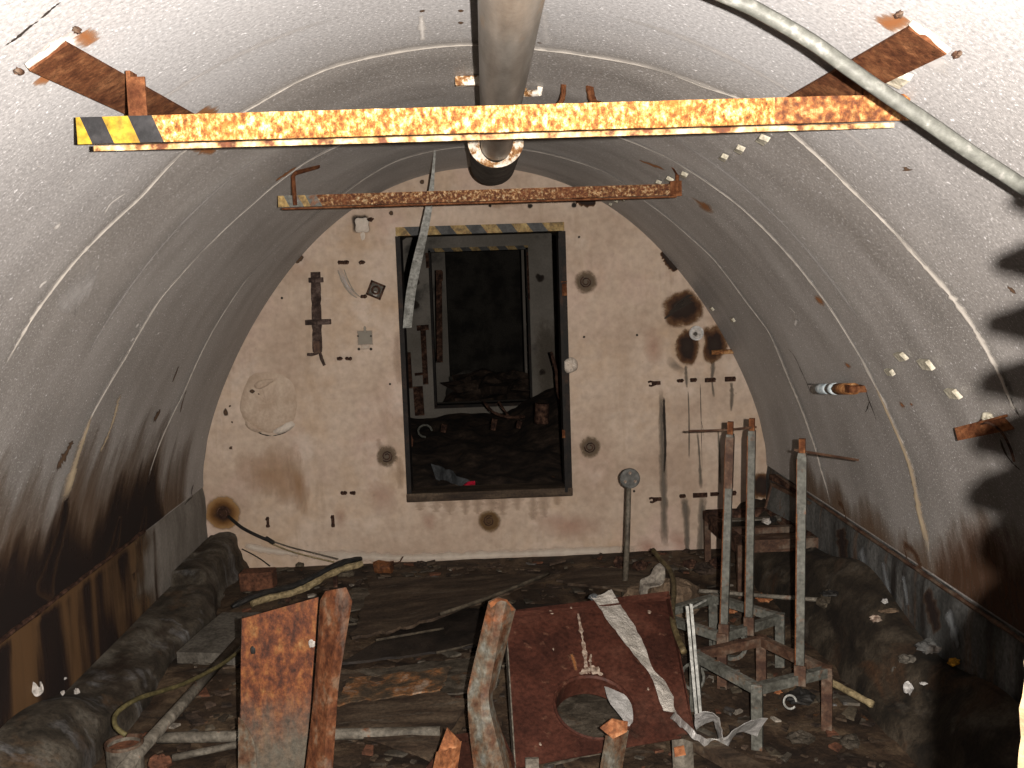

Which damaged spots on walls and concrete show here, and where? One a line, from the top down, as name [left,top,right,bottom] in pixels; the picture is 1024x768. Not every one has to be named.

water stain [0,419,185,600]
water stain [807,389,935,575]
corrosion [0,533,155,717]
water stain [924,589,960,650]